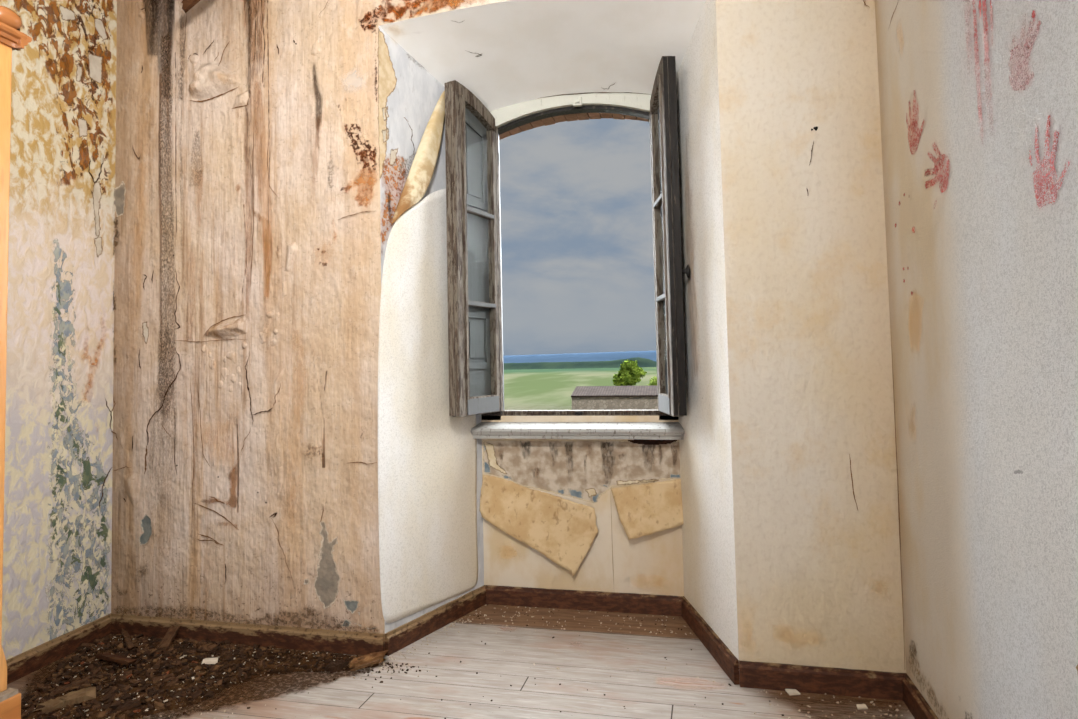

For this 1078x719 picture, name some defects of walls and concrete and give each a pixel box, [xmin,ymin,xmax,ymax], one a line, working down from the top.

water stain [143,0,182,194]
peeling [377,28,398,178]
peeling [46,240,109,640]
spalling [138,515,152,546]
crack [99,270,281,507]
spalling [304,522,376,631]
flaking render [483,439,681,503]